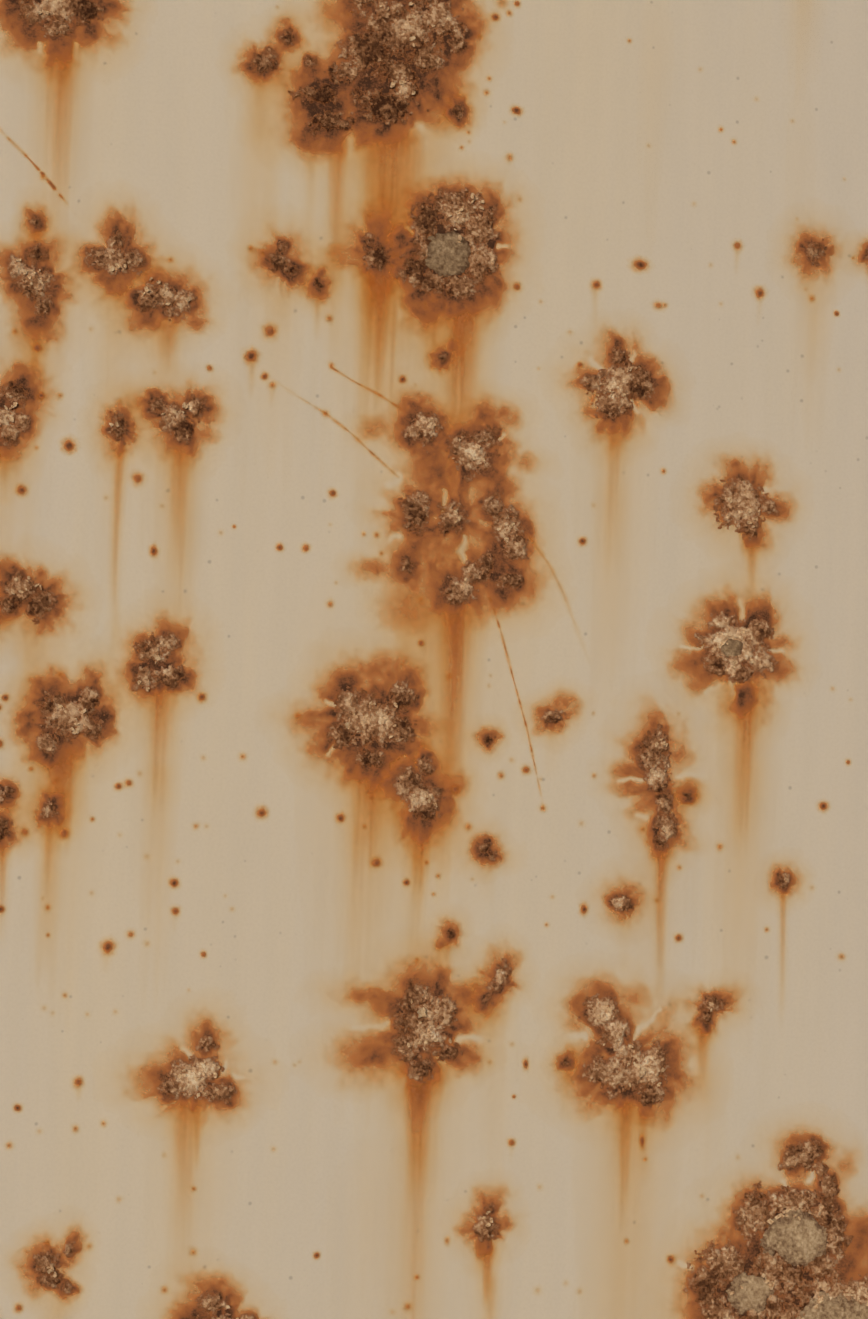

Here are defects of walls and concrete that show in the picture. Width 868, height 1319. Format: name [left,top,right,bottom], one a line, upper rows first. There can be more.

corrosion [0,0,125,65]
corrosion [240,0,498,153]
corrosion [81,213,203,330]
corrosion [340,183,519,370]
corrosion [575,333,670,433]
corrosion [366,376,534,689]
corrosion [675,597,790,718]
corrosion [0,668,116,849]
corrosion [301,659,463,844]
corrosion [348,955,516,1125]
corrosion [556,981,686,1117]
corrosion [668,1134,868,1319]